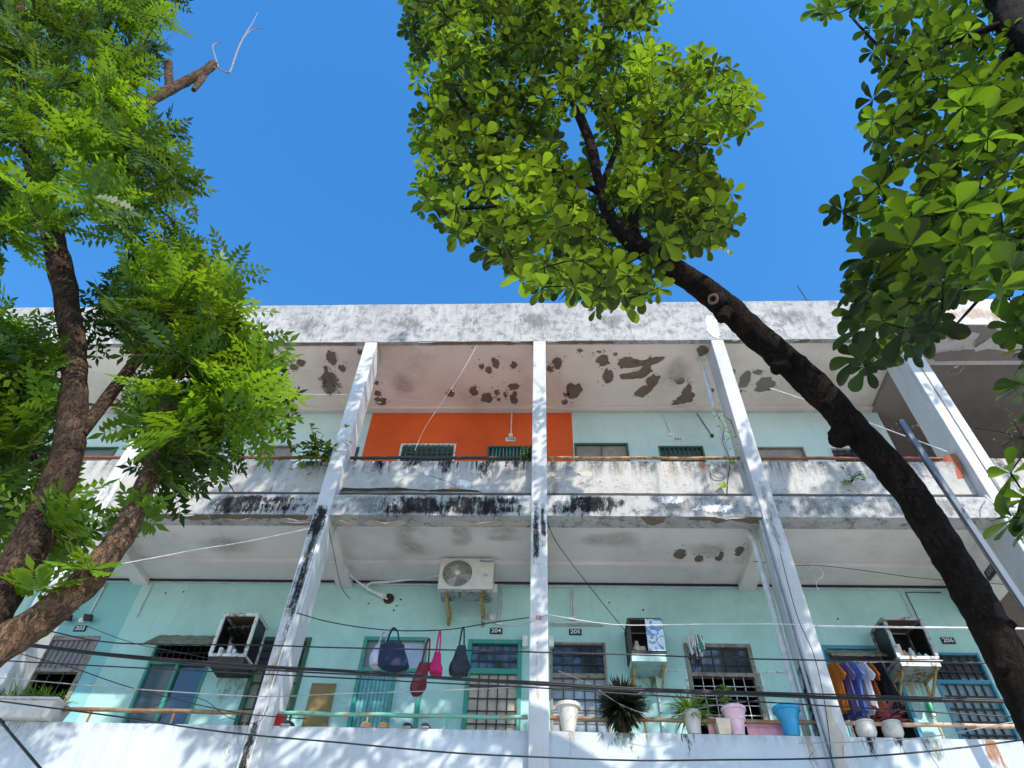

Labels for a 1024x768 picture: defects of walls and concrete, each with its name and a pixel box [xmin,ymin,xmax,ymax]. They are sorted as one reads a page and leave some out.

peeling [278,342,363,396]
spalling [417,341,533,404]
peeling [546,341,695,405]
peeling [733,369,782,396]
water stain [358,495,521,520]
water stain [533,496,624,558]
peeling [668,543,745,562]
water stain [208,494,327,679]